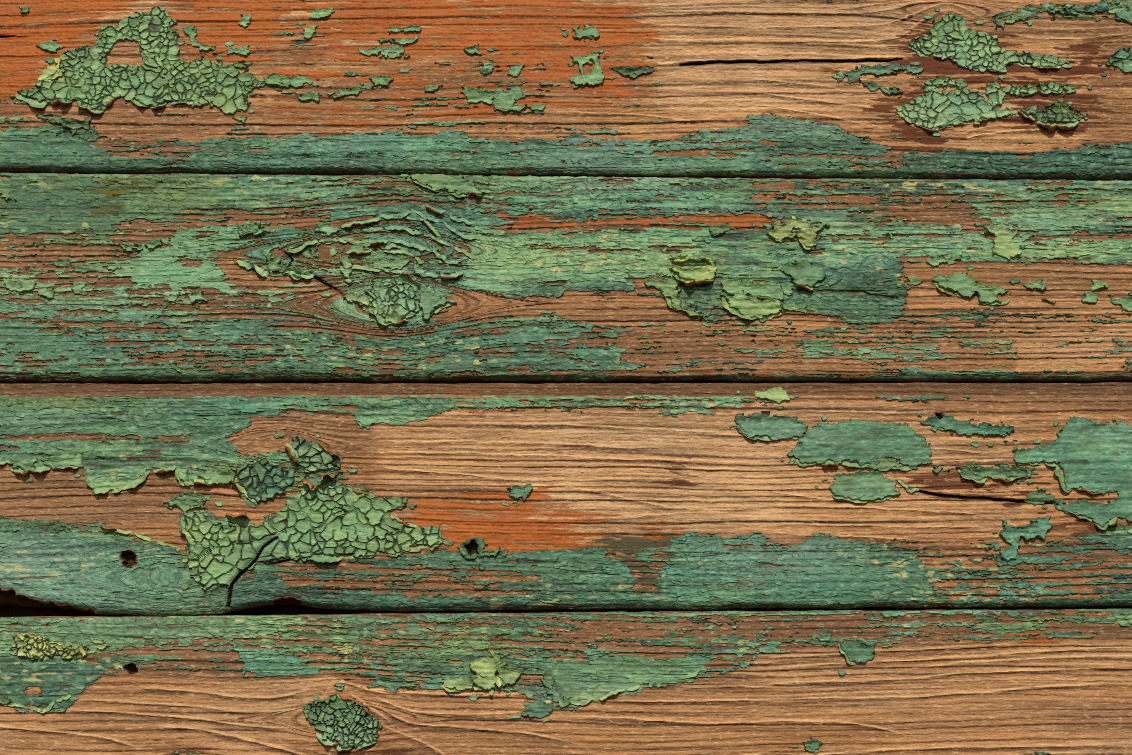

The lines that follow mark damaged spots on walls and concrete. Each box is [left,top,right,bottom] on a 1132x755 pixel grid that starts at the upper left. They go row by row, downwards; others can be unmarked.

peeling [9,6,394,140]
peeling [358,25,422,59]
peeling [460,43,546,112]
peeling [560,24,655,89]
peeling [831,7,1132,137]
peeling [236,174,490,329]
peeling [644,208,838,327]
peeling [0,433,508,591]
peeling [729,386,1132,576]
crack [227,537,290,607]
peeling [10,632,110,665]
peeling [302,683,383,752]